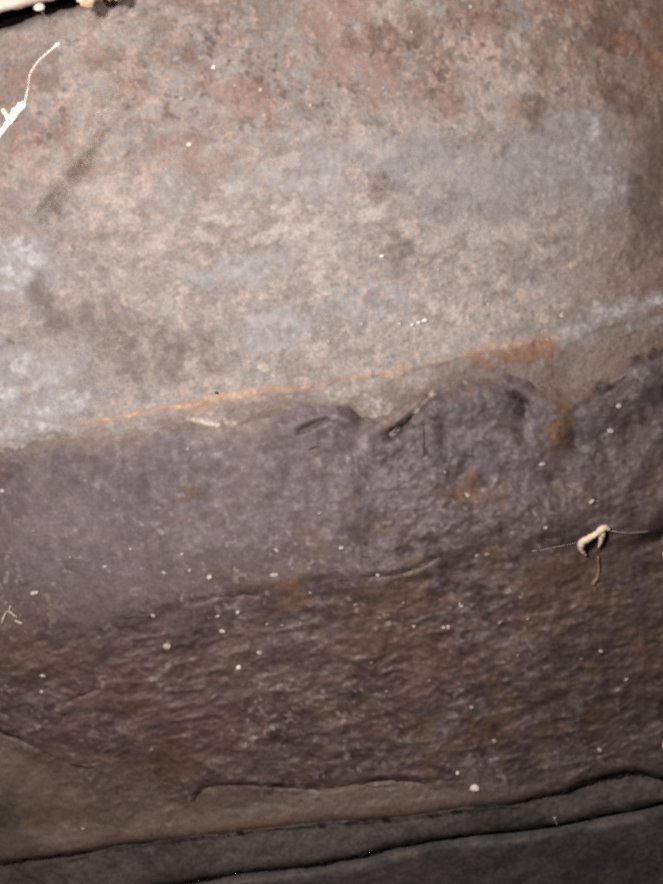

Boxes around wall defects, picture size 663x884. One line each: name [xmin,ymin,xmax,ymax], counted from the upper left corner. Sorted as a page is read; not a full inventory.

rust [156,384,311,413]